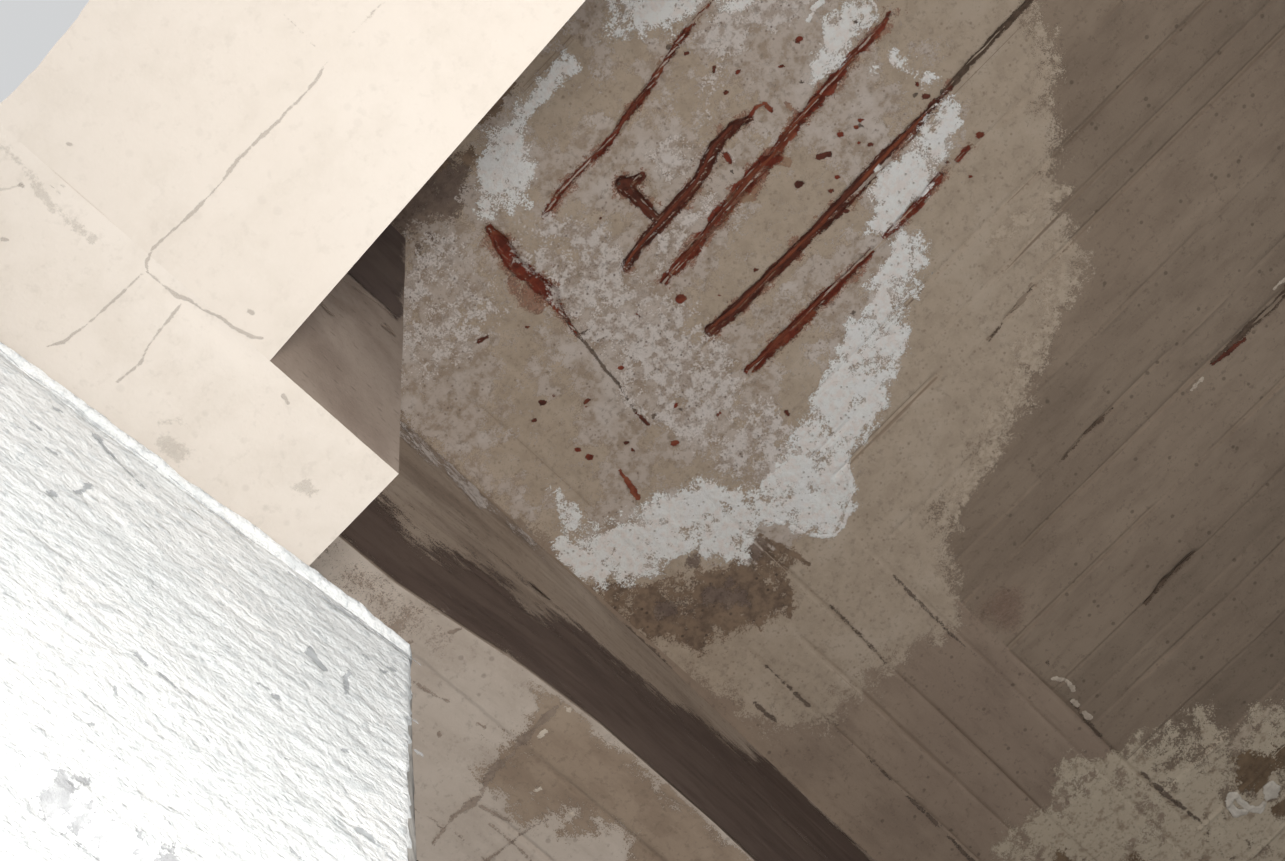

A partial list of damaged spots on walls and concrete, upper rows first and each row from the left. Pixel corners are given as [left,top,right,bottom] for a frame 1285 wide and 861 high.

rust [837,118,873,147]
water stain [324,0,1097,861]
rust [618,469,641,500]
water stain [981,697,1285,861]
peeling [1225,742,1285,822]
peeling [1048,847,1071,861]